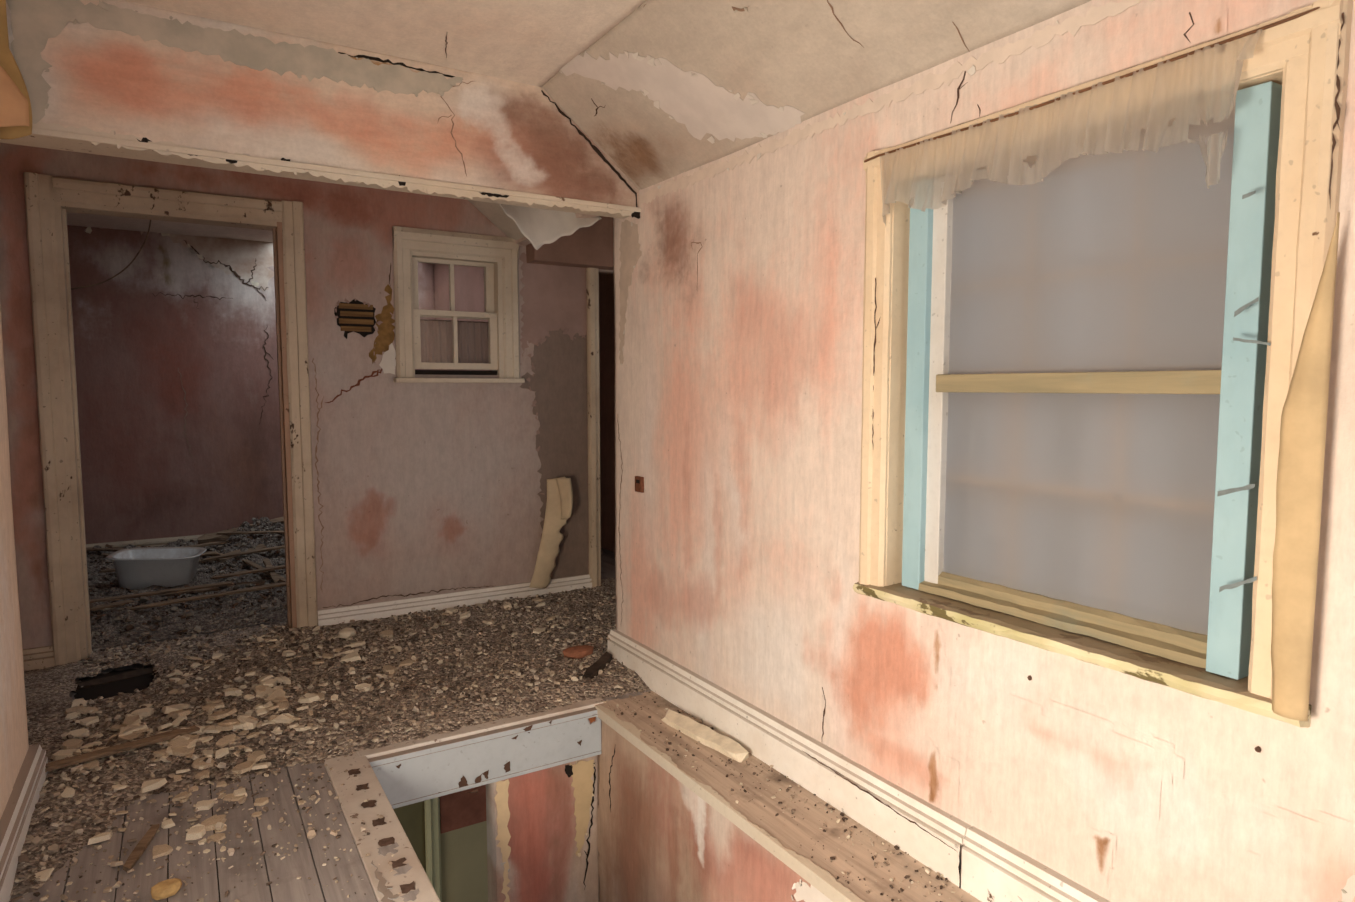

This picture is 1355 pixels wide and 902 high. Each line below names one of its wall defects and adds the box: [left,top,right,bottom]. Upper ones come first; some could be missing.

peeling [0,0,642,375]
crack [338,35,473,176]
peeling [560,51,805,144]
crack [827,0,862,46]
crack [152,240,273,424]
crack [312,358,494,608]
damp [45,22,863,662]
flaking render [520,324,589,579]
damp [792,548,959,815]
spalling [791,879,833,902]